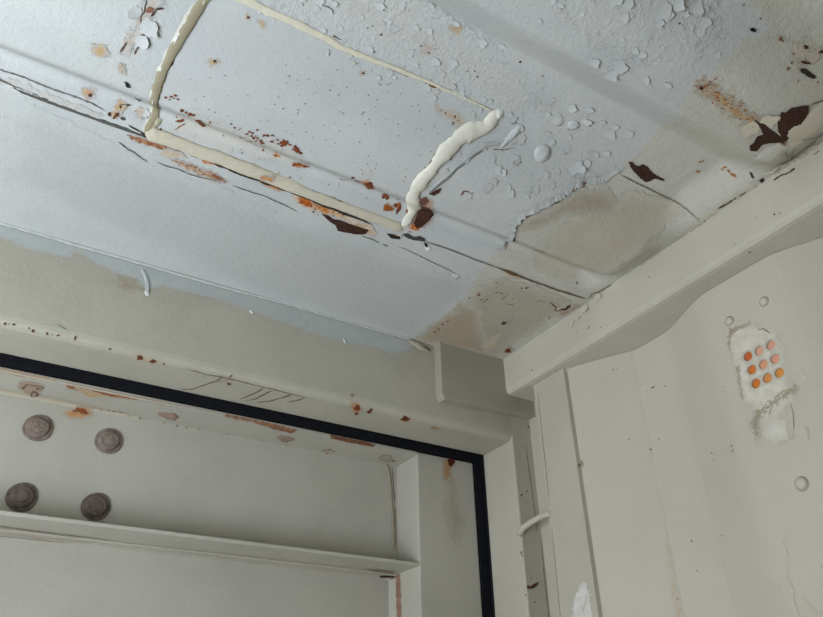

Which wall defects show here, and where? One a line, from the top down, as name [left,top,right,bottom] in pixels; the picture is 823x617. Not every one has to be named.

corrosion [126,134,229,184]
corrosion [163,94,313,179]
corrosion [328,155,402,214]
corrosion [685,74,823,152]
water stain [532,189,685,285]
corrosion [0,526,402,617]